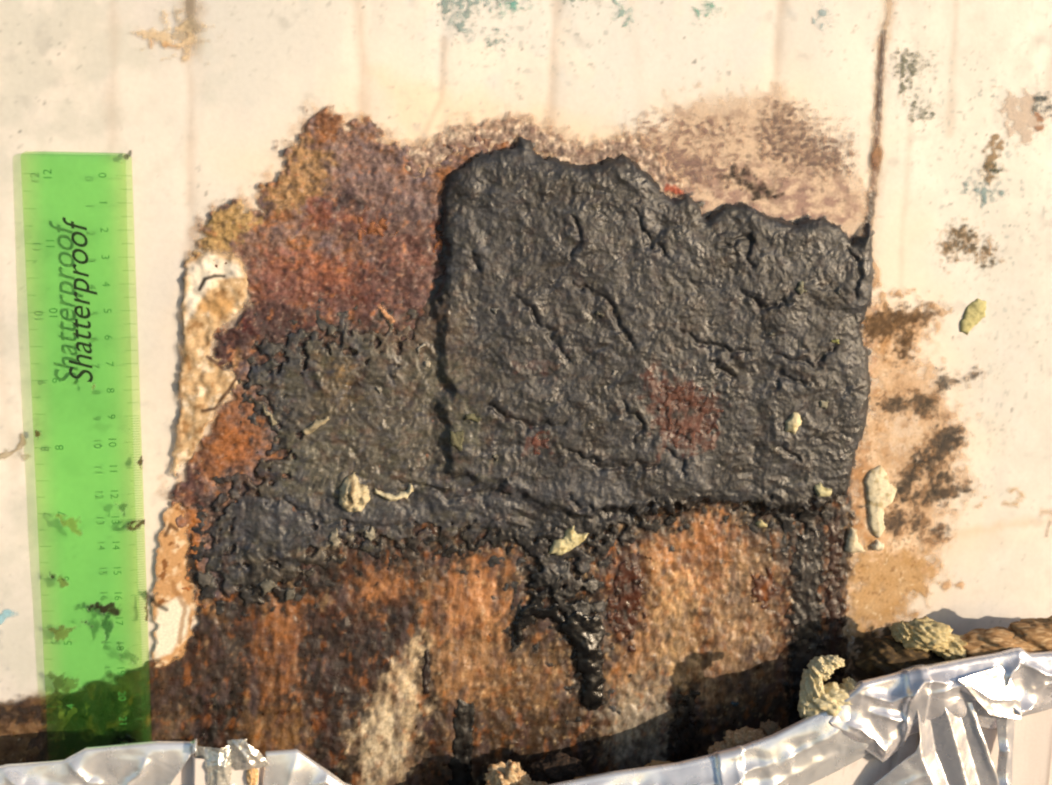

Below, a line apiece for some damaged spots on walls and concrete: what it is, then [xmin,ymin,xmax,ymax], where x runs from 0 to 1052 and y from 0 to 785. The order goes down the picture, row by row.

peeling [405,112,683,197]
damp [635,97,868,244]
crack [863,0,892,275]
damp [894,49,935,122]
damp [941,224,997,267]
damp [983,92,1052,184]
peeling [170,251,248,476]
rust [26,105,875,785]
damp [842,277,983,682]
peeling [143,503,197,667]